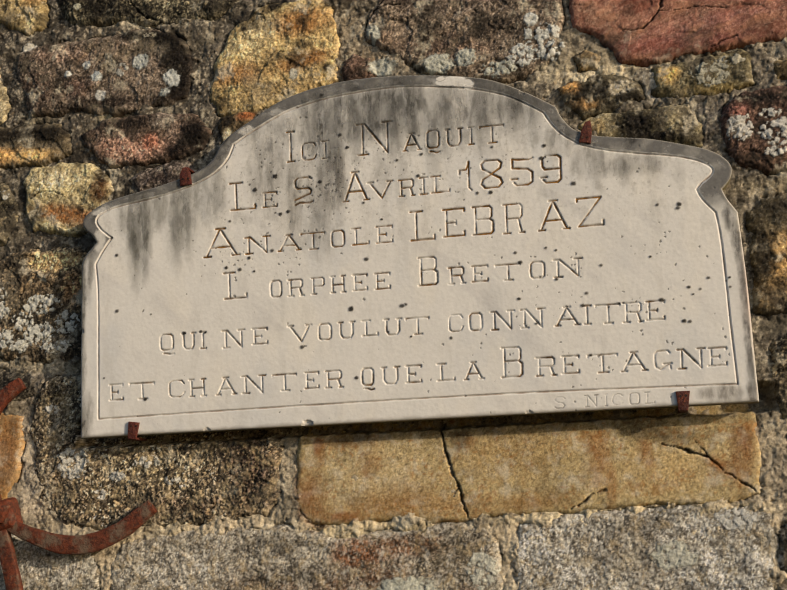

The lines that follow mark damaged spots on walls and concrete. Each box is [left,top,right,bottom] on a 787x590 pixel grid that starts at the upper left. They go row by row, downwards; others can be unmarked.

leakage [84,76,436,258]
leakage [469,78,731,200]
crack [441,427,468,513]
crack [679,447,755,490]